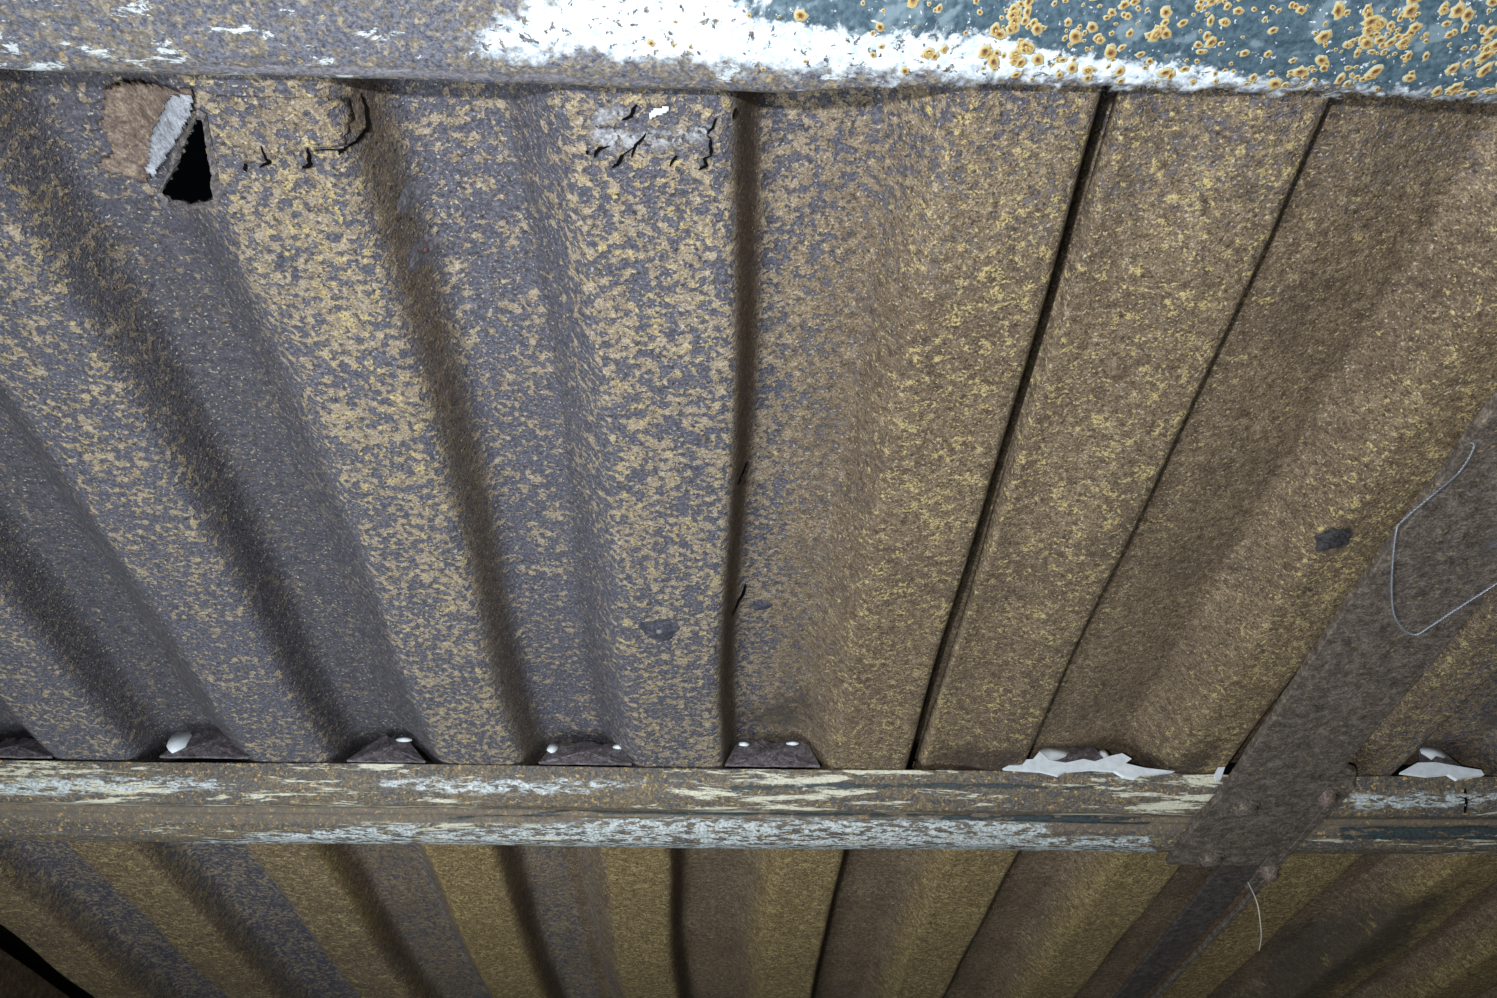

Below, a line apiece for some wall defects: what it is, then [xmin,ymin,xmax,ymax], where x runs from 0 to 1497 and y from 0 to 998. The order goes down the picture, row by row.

peeling [475,0,1497,101]
crack [585,104,736,170]
peeling [167,731,192,753]
peeling [0,774,226,796]
peeling [379,775,646,796]
peeling [1002,747,1175,780]
peeling [1214,767,1225,782]
peeling [152,817,1160,853]